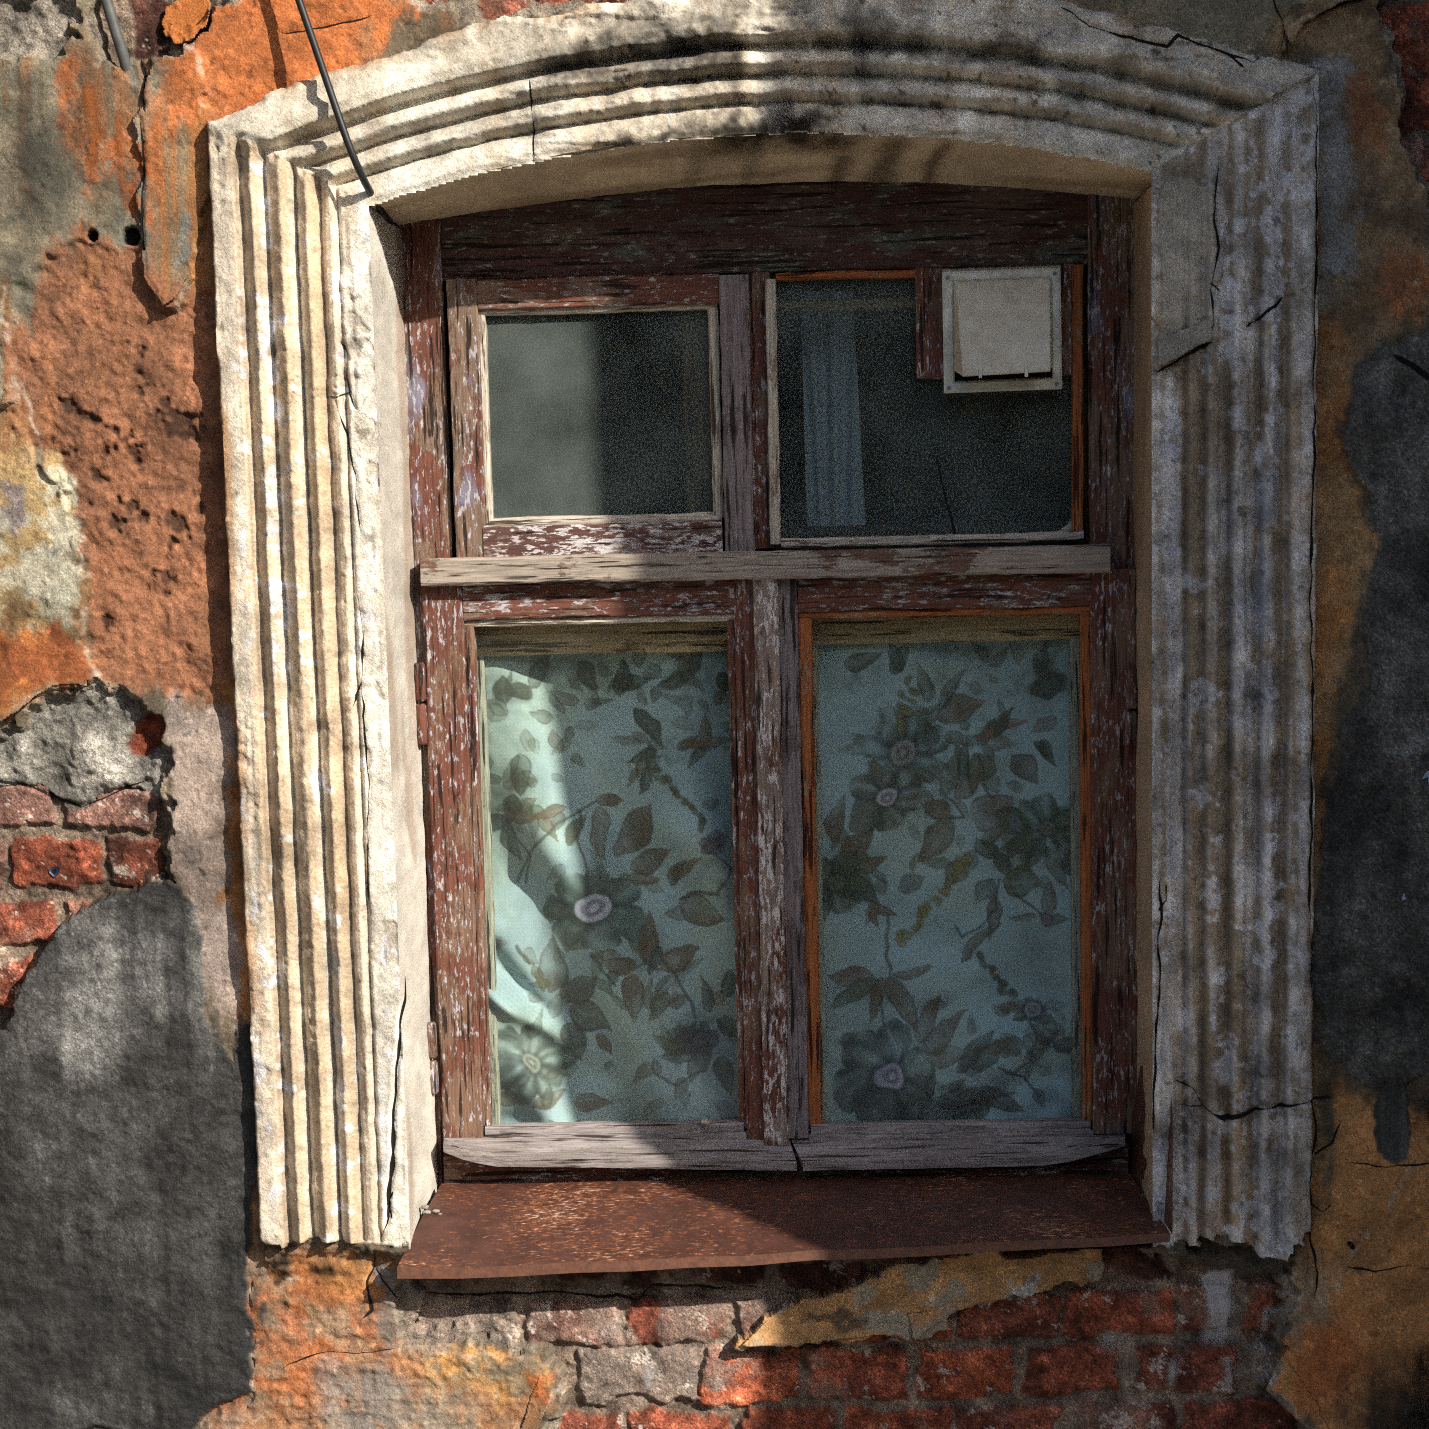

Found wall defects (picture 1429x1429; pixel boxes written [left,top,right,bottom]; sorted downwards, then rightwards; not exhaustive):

peeling [0,0,241,312]
spalling [411,0,629,24]
water stain [701,55,841,147]
crack [1061,0,1285,67]
peeling [1059,0,1347,61]
crack [1319,0,1361,15]
spalling [1377,0,1429,189]
crack [1156,90,1318,990]
spalling [0,287,177,1030]
crack [1152,877,1429,1298]
spalling [201,1151,1429,1429]